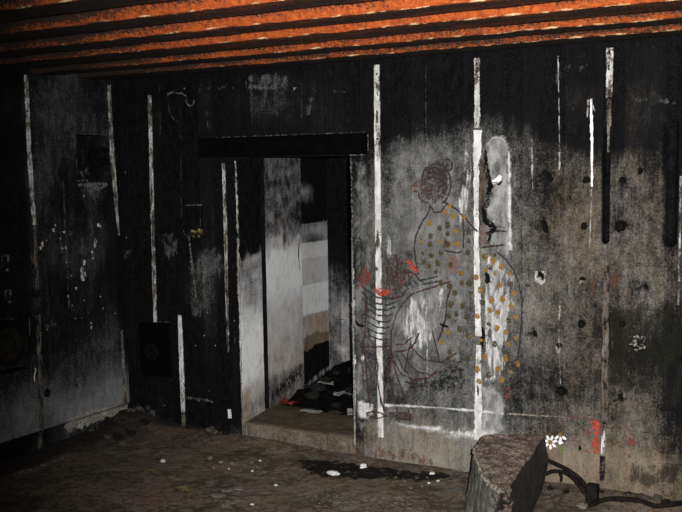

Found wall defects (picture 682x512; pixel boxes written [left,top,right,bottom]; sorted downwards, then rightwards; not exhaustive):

crack [479,150,505,243]
spalling [535,269,546,285]